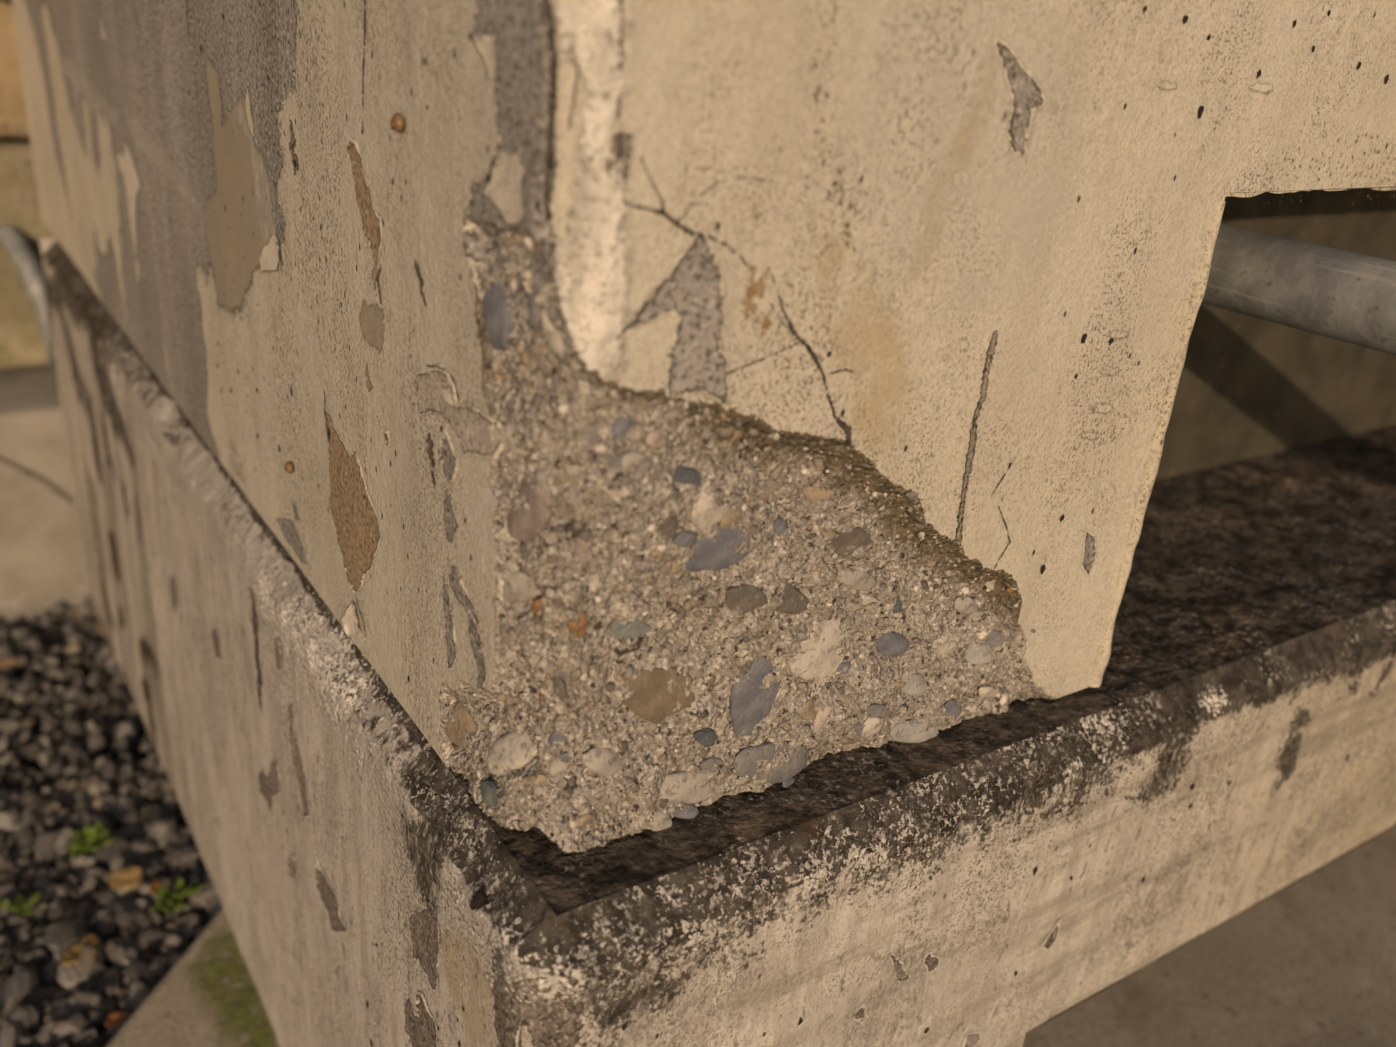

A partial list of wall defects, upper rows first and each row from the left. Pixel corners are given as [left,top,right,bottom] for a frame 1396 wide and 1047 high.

peeling [24,0,302,485]
crack [544,0,580,221]
crack [616,0,857,445]
peeling [325,407,381,638]
spalling [414,0,1057,853]
crack [951,330,1016,569]
water stain [981,701,1200,829]
water stain [1273,704,1327,794]
water stain [1344,641,1396,699]